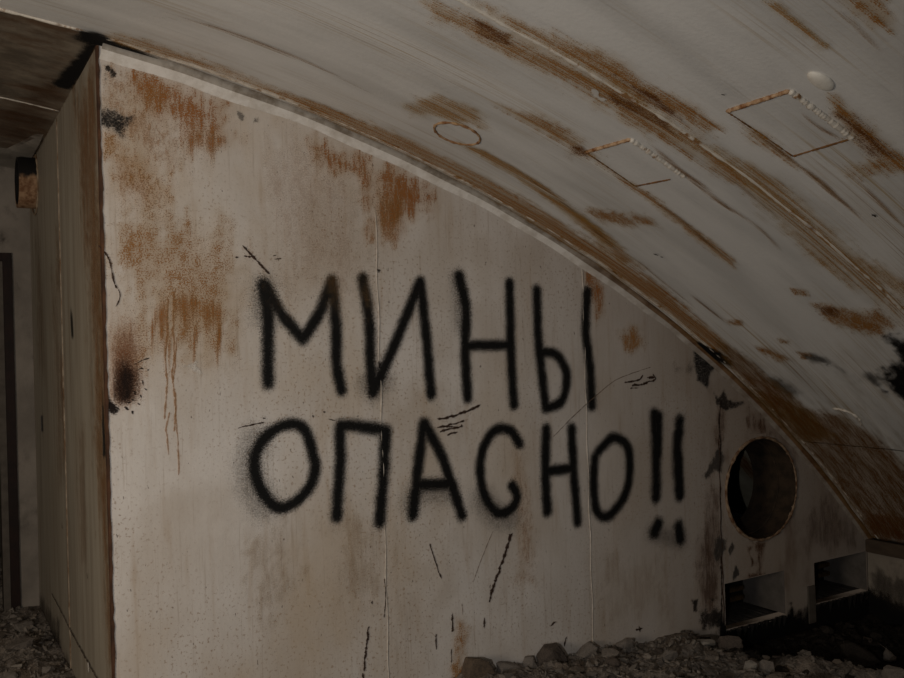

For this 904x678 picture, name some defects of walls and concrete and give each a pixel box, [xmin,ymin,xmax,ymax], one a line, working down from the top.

corrosion [425,0,904,336]
corrosion [105,33,835,475]
peeling [714,392,744,410]
peeling [705,449,724,478]
crack [52,594,97,678]